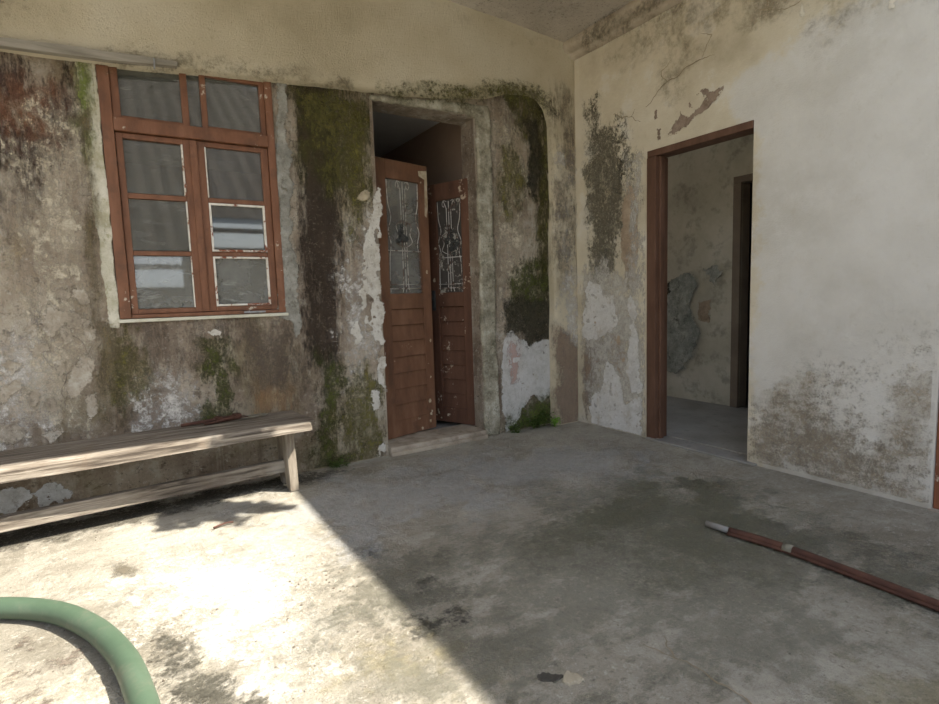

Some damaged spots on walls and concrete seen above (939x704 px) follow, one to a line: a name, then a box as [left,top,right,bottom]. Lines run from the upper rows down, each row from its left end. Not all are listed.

crack [615,33,712,122]
peeling [654,86,724,140]
damp [0,52,167,441]
damp [293,79,377,391]
peeling [350,185,388,411]
damp [377,80,645,427]
flaking render [501,331,550,432]
peeling [581,183,643,435]
peeling [667,265,723,374]
damp [750,374,930,497]